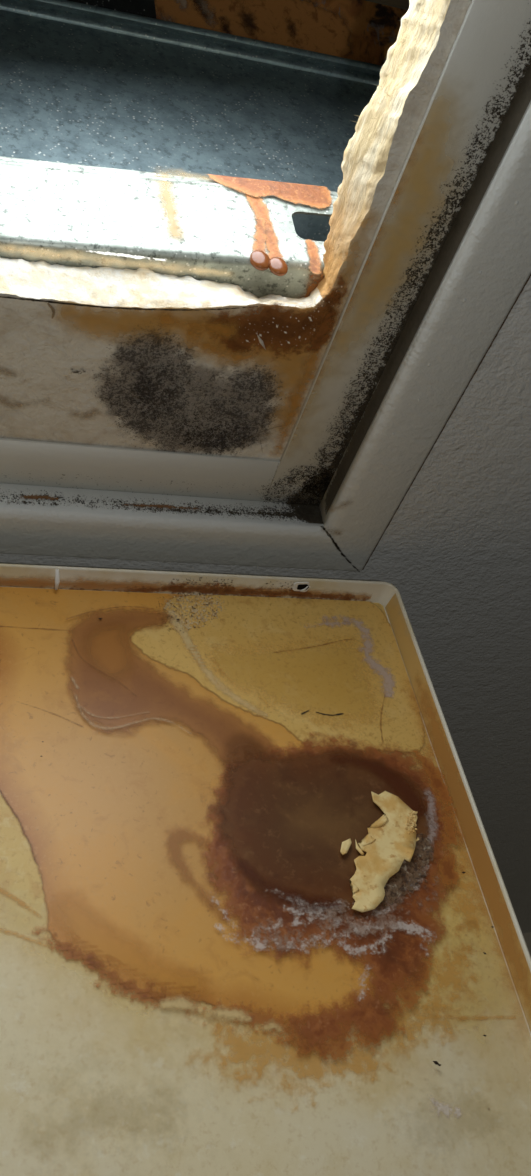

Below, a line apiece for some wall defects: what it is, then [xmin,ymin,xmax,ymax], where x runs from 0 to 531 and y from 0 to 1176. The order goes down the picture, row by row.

rust [154,0,352,57]
rust [162,177,179,236]
rust [207,174,332,276]
water stain [62,21,531,524]
water stain [0,587,512,1054]
peeling [340,791,419,913]